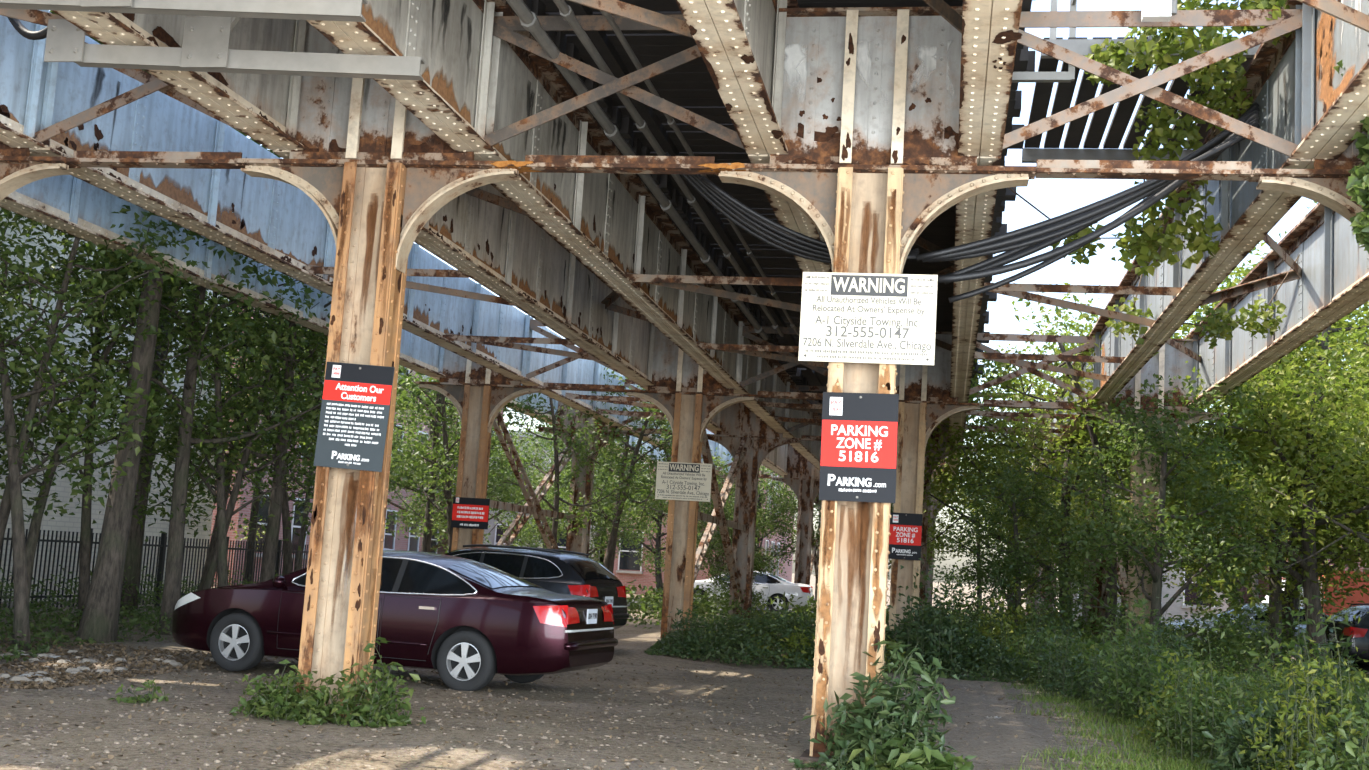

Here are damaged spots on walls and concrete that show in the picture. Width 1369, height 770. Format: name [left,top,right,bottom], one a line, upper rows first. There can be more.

corrosion [51,124,108,151]
peeling [420,80,497,152]
peeling [700,52,746,148]
peeling [761,90,787,152]
peeling [841,133,851,160]
peeling [846,33,854,66]
corrosion [992,0,1023,143]
corrosion [1315,12,1354,115]
corrosion [111,168,334,279]
corrosion [364,187,404,292]
corrosion [838,195,895,273]
corrosion [822,500,883,619]